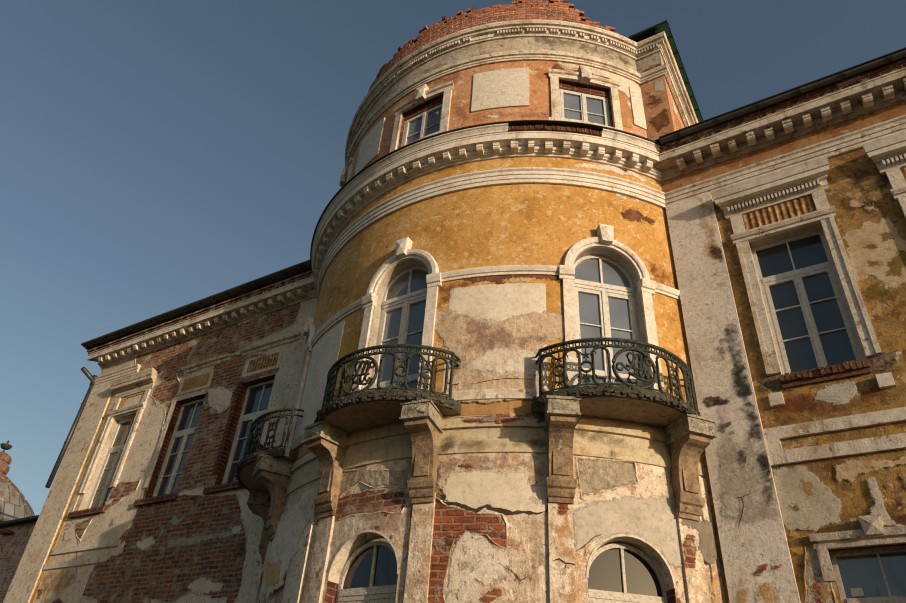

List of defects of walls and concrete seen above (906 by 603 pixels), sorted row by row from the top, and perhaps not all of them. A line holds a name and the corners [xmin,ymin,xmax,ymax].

peeling [842,198,906,299]
spalling [75,302,302,603]
peeling [263,498,319,602]
spalling [334,467,413,554]
spalling [428,455,548,603]
peeling [435,309,565,404]
spalling [533,456,639,552]
spalling [651,534,717,568]
spalling [703,396,730,408]
damp [720,324,762,441]
damp [759,455,774,498]
peeling [717,421,906,603]